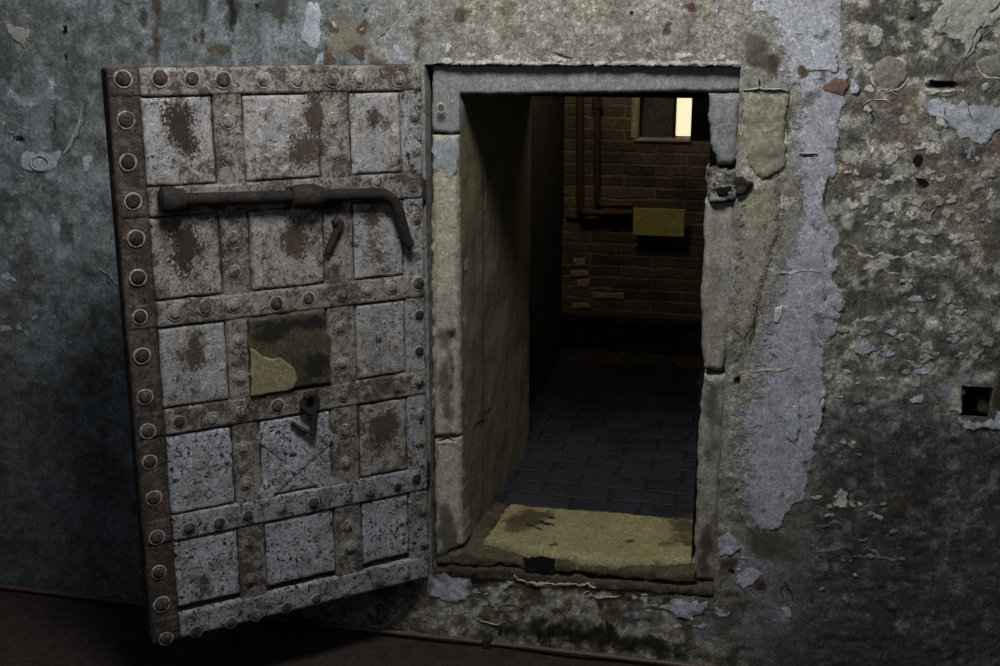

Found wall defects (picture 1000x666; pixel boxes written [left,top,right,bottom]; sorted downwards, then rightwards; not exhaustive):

flaking render [299,2,324,65]
corrosion [153,95,202,165]
corrosion [283,92,328,173]
corrosion [360,102,383,135]
corrosion [163,214,213,282]
corrosion [274,217,311,268]
flaking render [731,0,1000,534]
corrosion [180,331,208,373]
damp [505,509,555,532]
flaking render [717,530,764,588]
flaking render [817,538,906,577]
peeling [420,573,513,621]